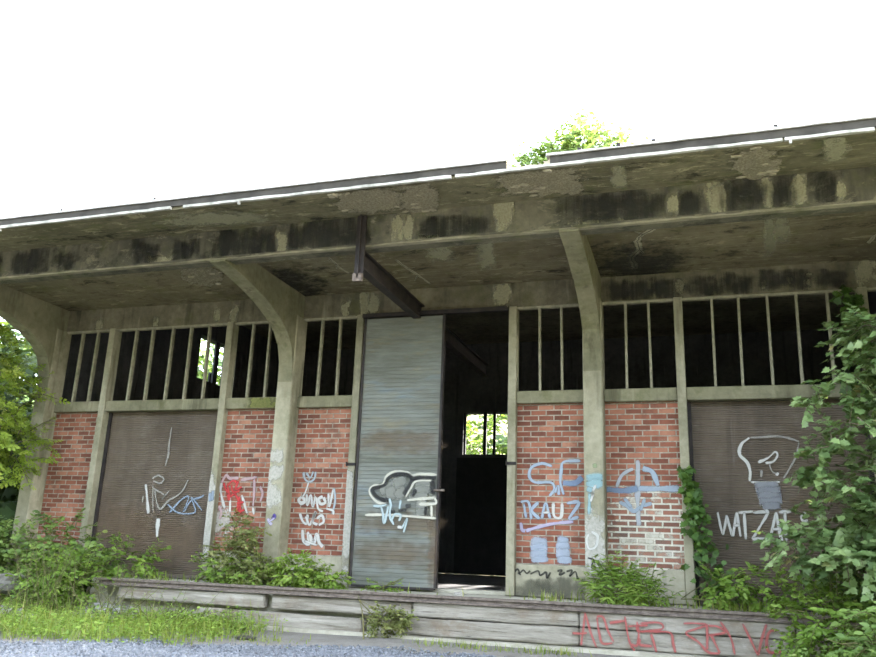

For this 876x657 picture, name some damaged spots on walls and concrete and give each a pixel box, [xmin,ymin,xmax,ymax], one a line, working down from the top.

spalling [725,146,782,180]
leakage [824,137,851,162]
spalling [327,183,440,215]
leakage [565,166,846,222]
leakage [0,249,73,275]
leakage [132,238,158,264]
leakage [168,210,370,260]
leakage [271,267,328,296]
leakage [391,202,514,240]
leakage [594,243,876,300]